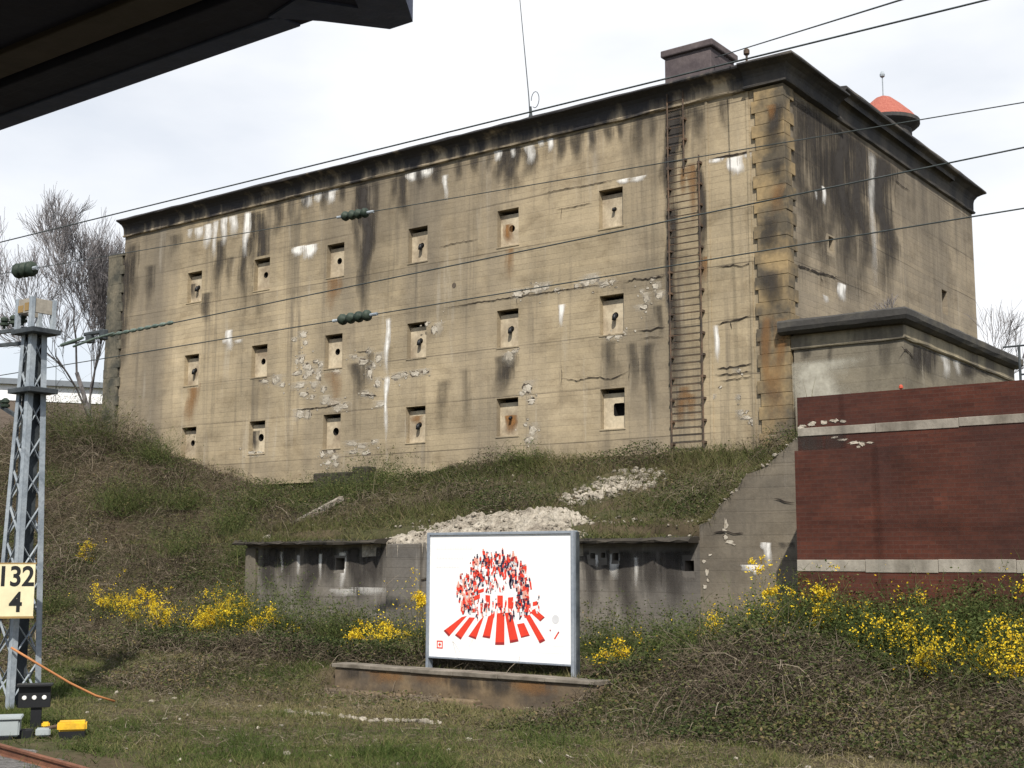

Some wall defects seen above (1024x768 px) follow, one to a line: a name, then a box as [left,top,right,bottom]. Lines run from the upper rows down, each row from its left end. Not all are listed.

water stain [496,131,594,178]
water stain [700,154,747,249]
water stain [769,104,897,273]
water stain [189,213,266,283]
water stain [292,244,316,257]
spalling [511,273,617,303]
spalling [259,331,430,419]
crack [561,367,630,381]
crack [716,363,752,381]
spalling [797,419,846,428]
spalling [318,440,380,469]
peeling [831,436,874,448]